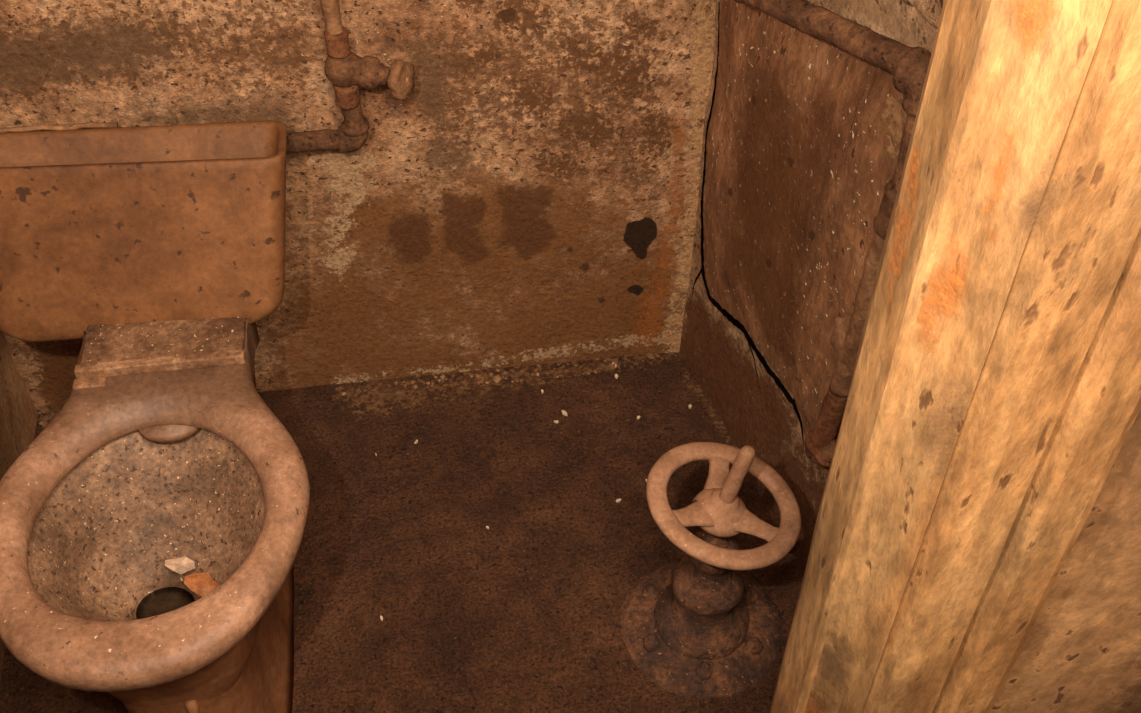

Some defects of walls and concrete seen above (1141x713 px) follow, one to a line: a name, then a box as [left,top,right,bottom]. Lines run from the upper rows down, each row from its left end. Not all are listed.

leakage [0,0,317,133]
leakage [269,0,831,561]
crack [690,1,804,447]